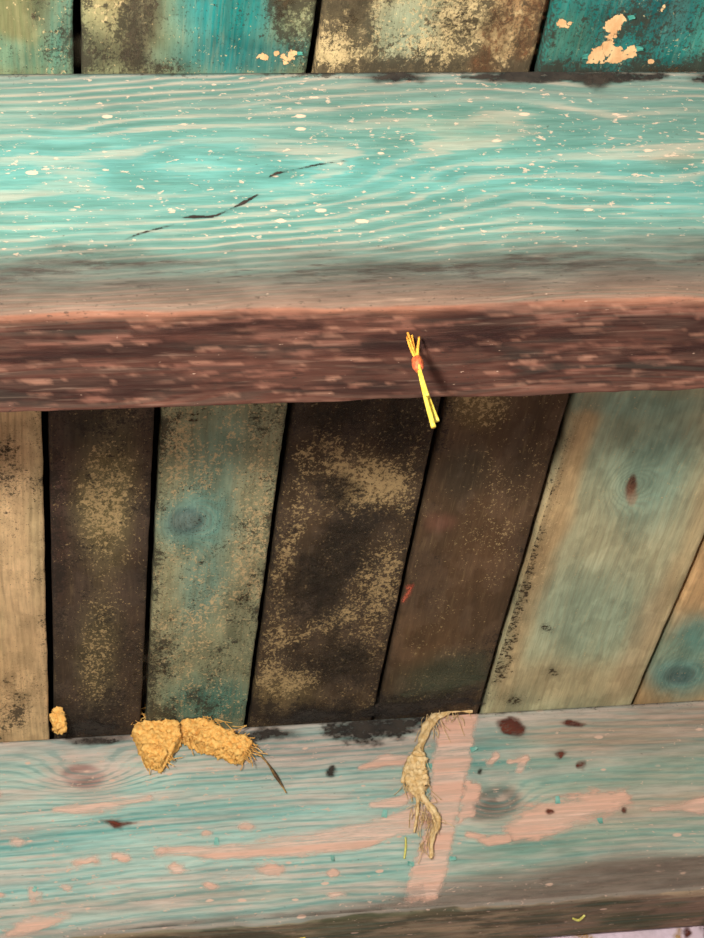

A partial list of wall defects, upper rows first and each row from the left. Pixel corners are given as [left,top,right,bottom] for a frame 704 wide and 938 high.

water stain [435,0,541,72]
peeling [582,14,654,64]
crack [183,162,333,218]
peeling [488,753,529,772]
peeling [54,797,150,813]
peeling [157,714,480,901]
peeling [466,790,631,845]
peeling [677,798,704,812]
peeling [7,918,61,935]